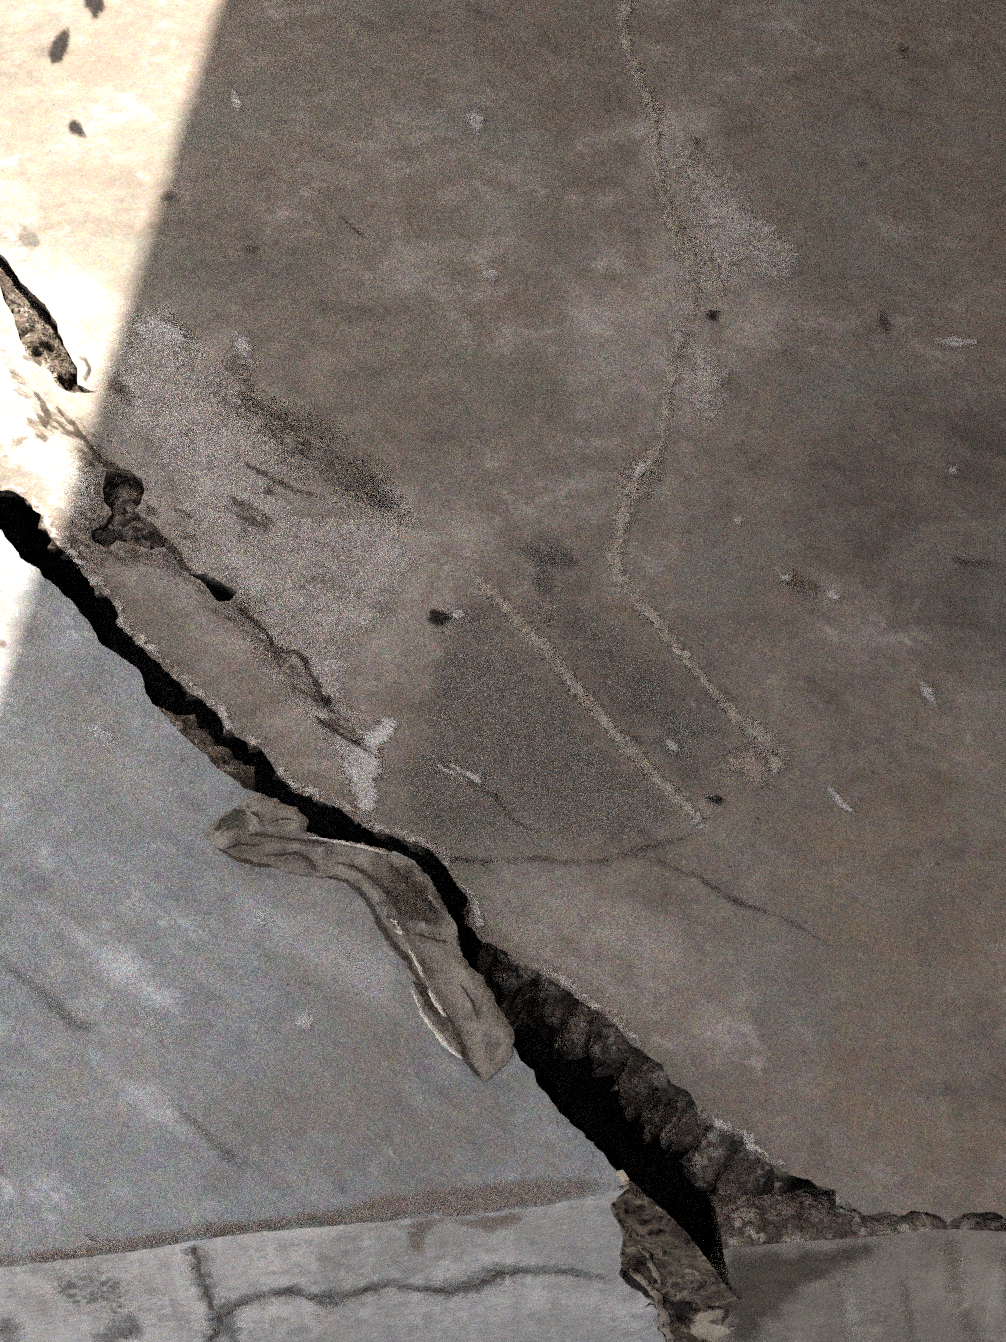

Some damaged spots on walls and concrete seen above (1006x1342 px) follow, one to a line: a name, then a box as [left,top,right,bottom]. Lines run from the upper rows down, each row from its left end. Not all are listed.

crack [0,254,133,477]
crack [244,461,313,496]
crack [0,490,1000,1259]
spalling [548,969,606,1009]
spalling [713,1117,785,1164]
crack [185,1246,604,1342]
spalling [610,1170,1006,1342]